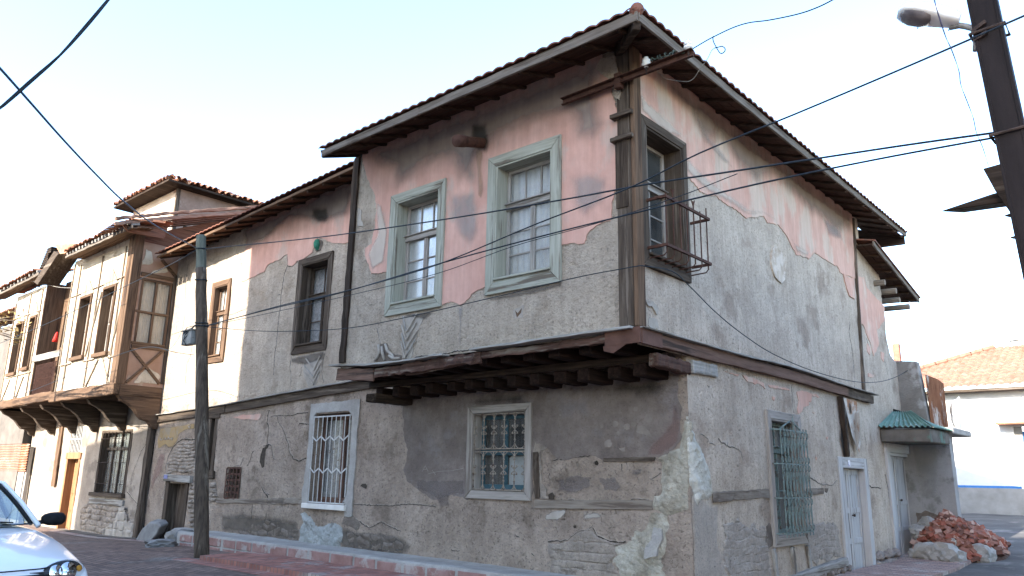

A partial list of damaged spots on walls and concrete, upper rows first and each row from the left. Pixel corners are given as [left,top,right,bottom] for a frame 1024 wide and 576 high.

flaking render [241,54,621,305]
flaking render [640,54,885,362]
crack [229,259,325,467]
flaking render [167,441,195,529]
flaking render [342,515,403,554]
crack [494,525,625,556]